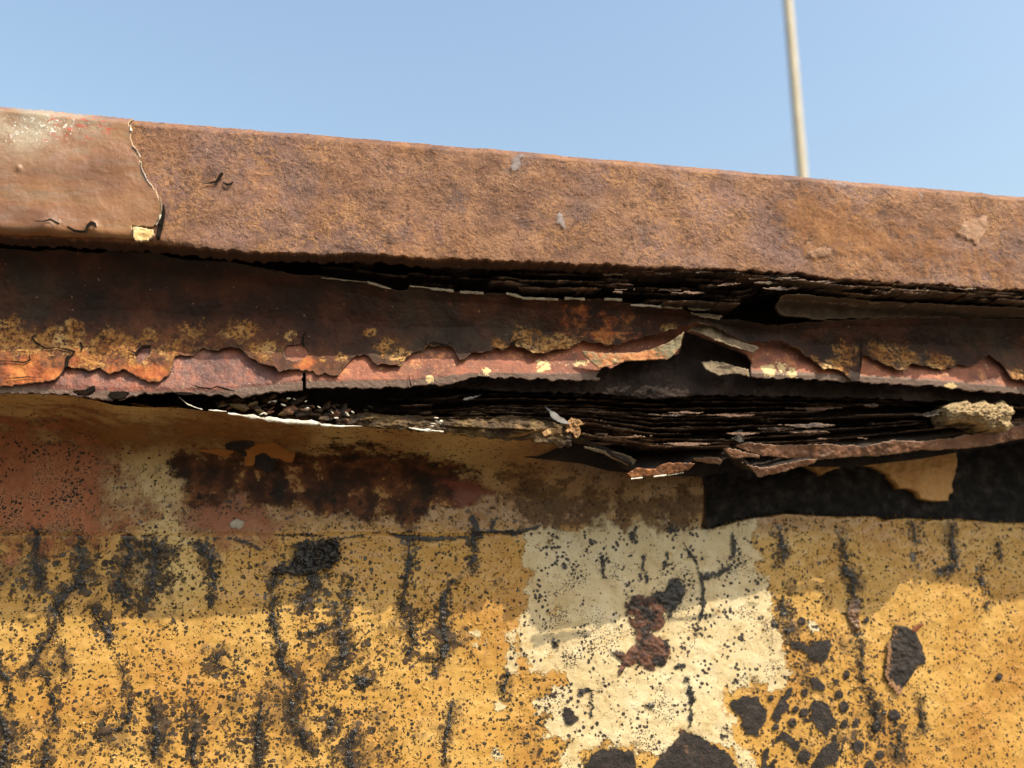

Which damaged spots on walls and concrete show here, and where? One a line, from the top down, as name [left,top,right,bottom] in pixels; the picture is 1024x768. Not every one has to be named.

crack [156,205,165,240]
spalling [807,246,831,258]
peeling [320,262,1024,320]
peeling [179,397,362,427]
peeling [360,391,974,454]
peeling [1010,406,1024,426]
peeling [197,443,295,466]
peeling [504,442,1024,768]
corrosion [611,595,671,675]
peeling [490,747,504,764]